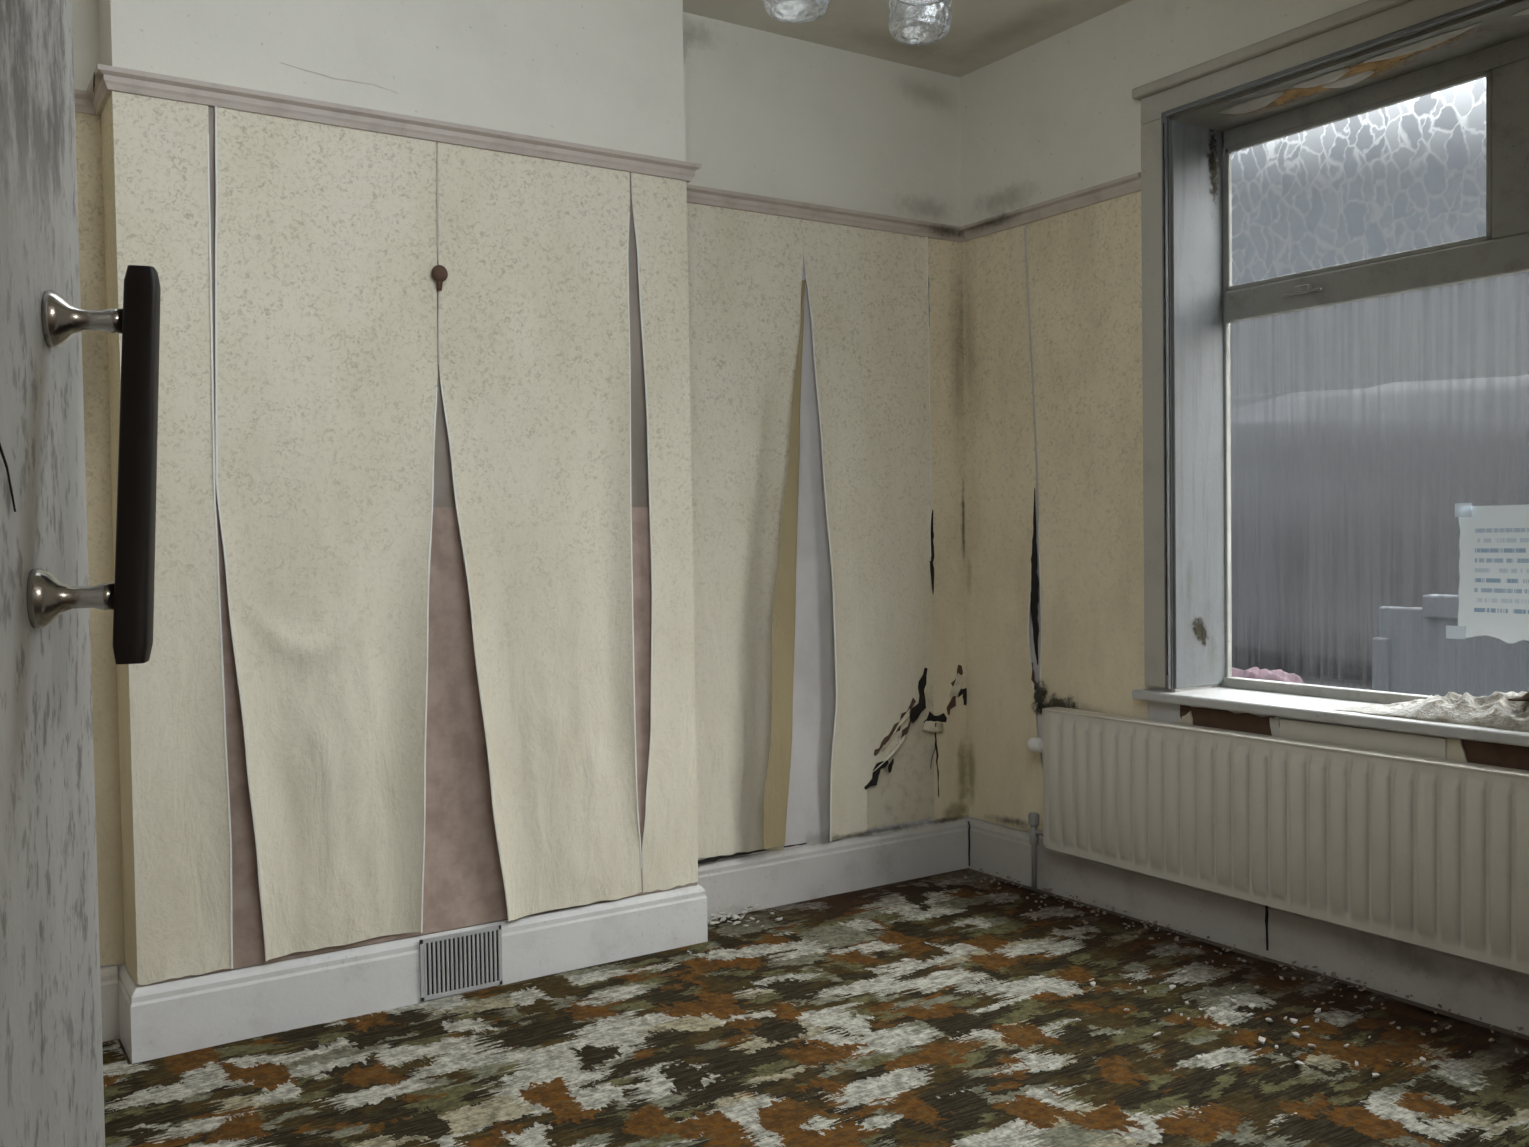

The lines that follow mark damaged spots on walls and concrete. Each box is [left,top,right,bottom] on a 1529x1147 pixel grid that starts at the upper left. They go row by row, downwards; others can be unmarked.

crack [930,723,939,797]